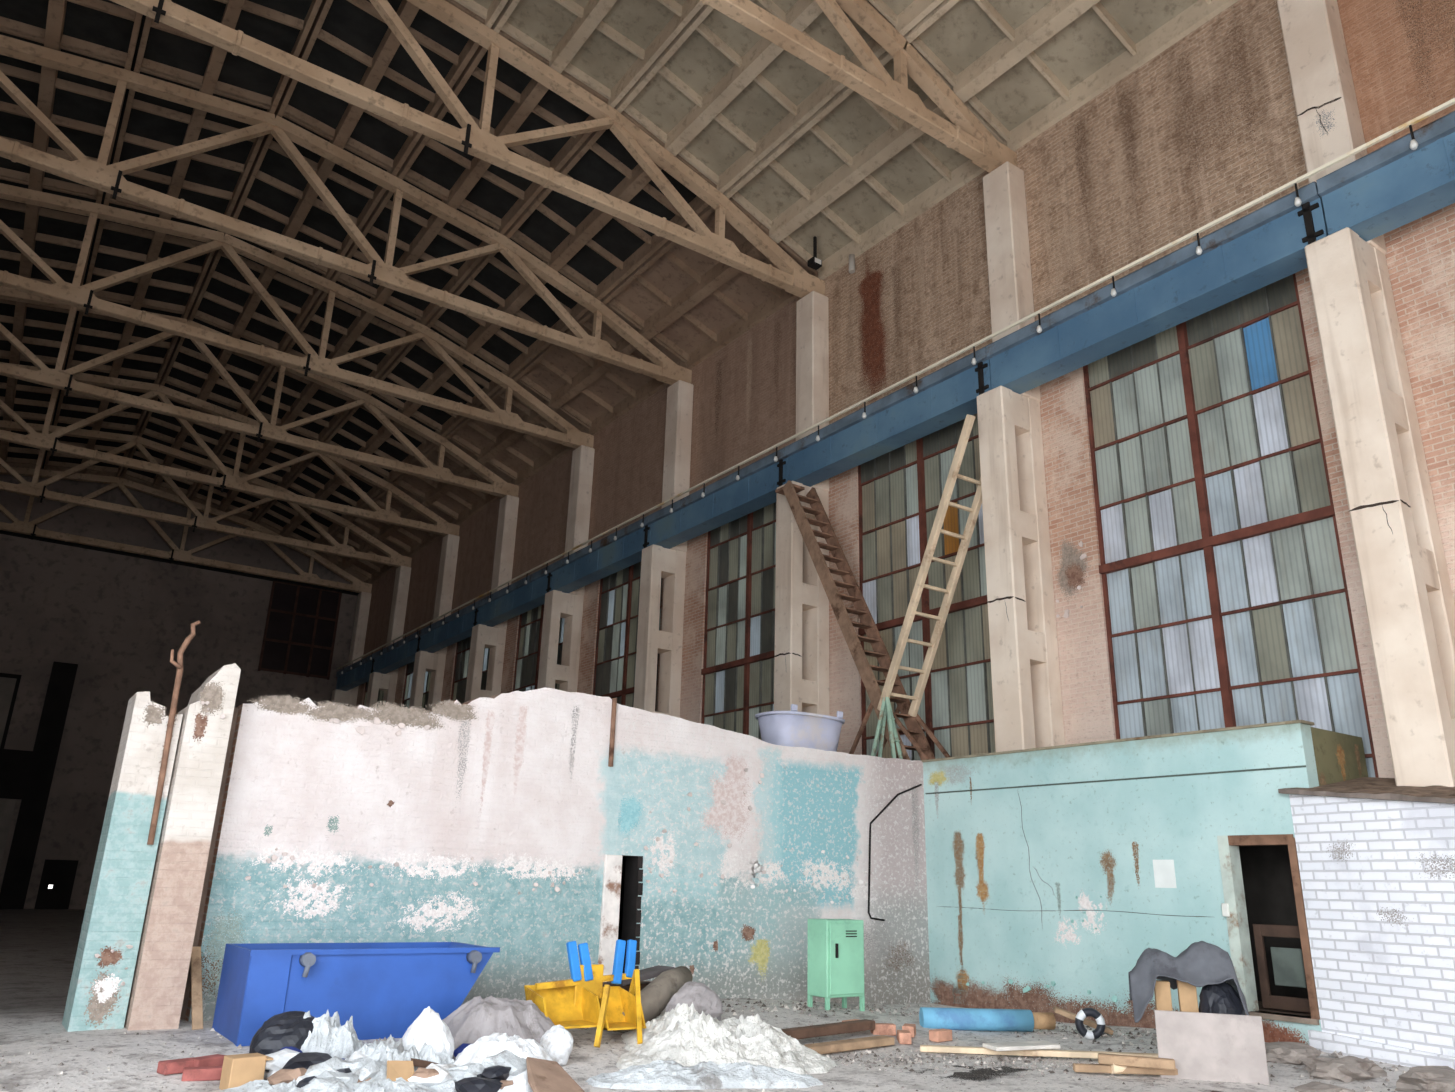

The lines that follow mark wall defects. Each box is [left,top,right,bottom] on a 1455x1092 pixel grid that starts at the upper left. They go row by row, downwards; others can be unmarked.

water stain [856,209,959,404]
crack [1350,499,1410,533]
peeling [186,844,595,1010]
corrosion [951,829,989,996]
crack [962,790,1205,929]
corrosion [1099,841,1140,904]